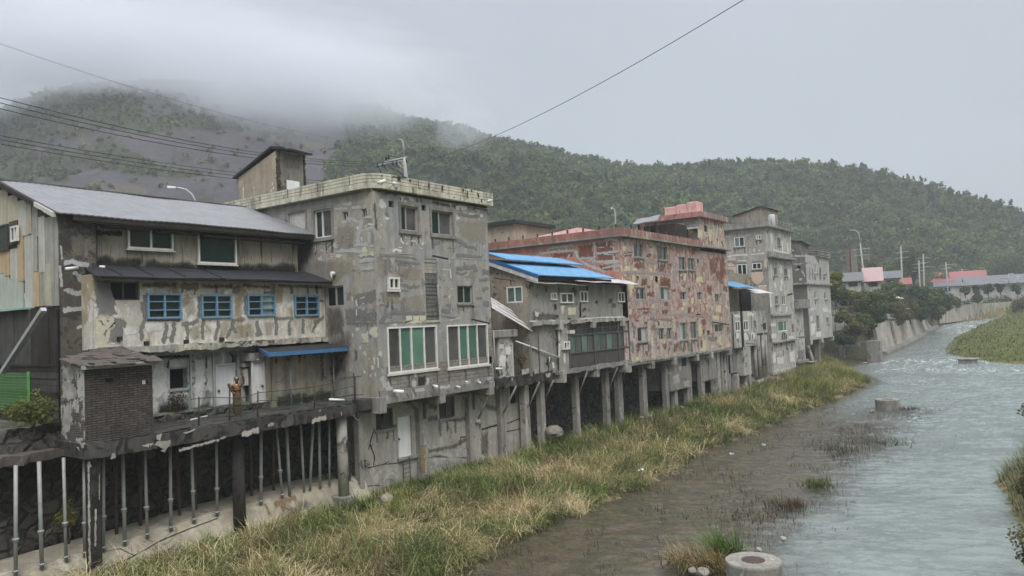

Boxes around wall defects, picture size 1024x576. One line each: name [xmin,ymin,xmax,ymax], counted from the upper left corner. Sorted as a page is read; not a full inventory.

peeling [314,199,424,264]
water stain [97,241,333,288]
peeling [579,253,659,319]
peeling [92,302,183,349]
water stain [275,309,358,407]
peeling [350,297,384,378]
peeling [393,315,435,326]
crack [368,428,397,486]